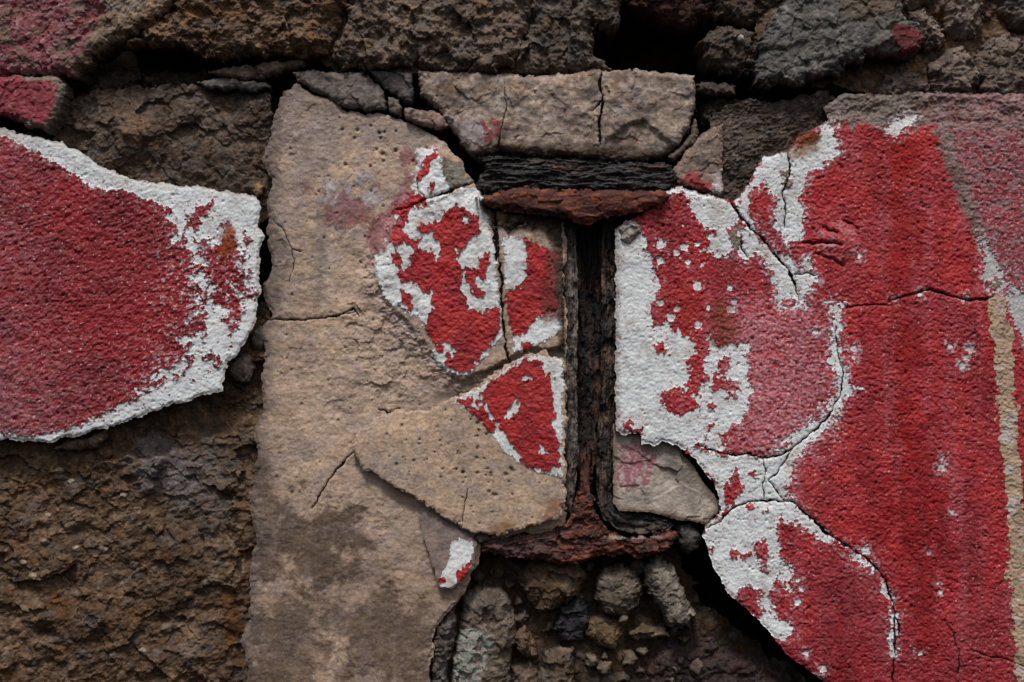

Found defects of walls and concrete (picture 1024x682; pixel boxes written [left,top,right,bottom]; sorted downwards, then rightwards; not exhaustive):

spalling [319,1,376,82]
spalling [388,66,433,81]
crack [592,71,604,145]
spalling [0,83,278,682]
peeling [372,145,565,478]
crack [492,211,511,365]
peeling [419,0,1024,682]
crack [730,152,859,298]
crack [312,452,354,508]
crack [697,288,993,682]